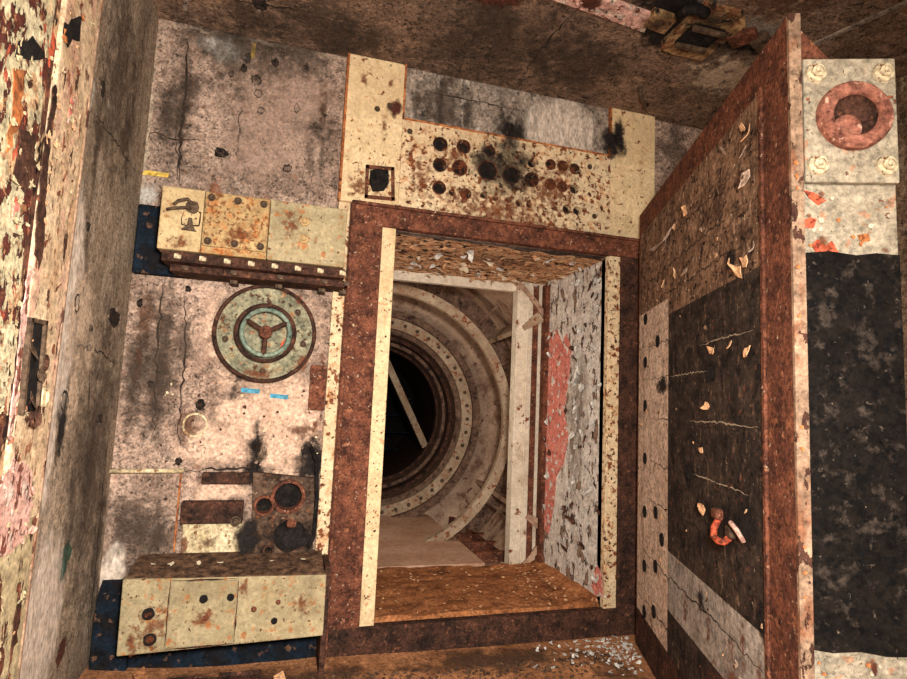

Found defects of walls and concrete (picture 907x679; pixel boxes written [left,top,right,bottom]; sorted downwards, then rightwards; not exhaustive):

peeling [53,3,95,49]
crack [91,0,345,204]
corrosion [337,52,350,202]
corrosion [357,157,395,202]
corrosion [383,64,611,156]
damp [502,99,593,151]
damp [614,121,625,147]
peeling [401,243,602,550]
peeling [0,453,38,557]
peeling [0,580,28,676]
peeling [490,563,567,605]
peeling [590,563,613,598]